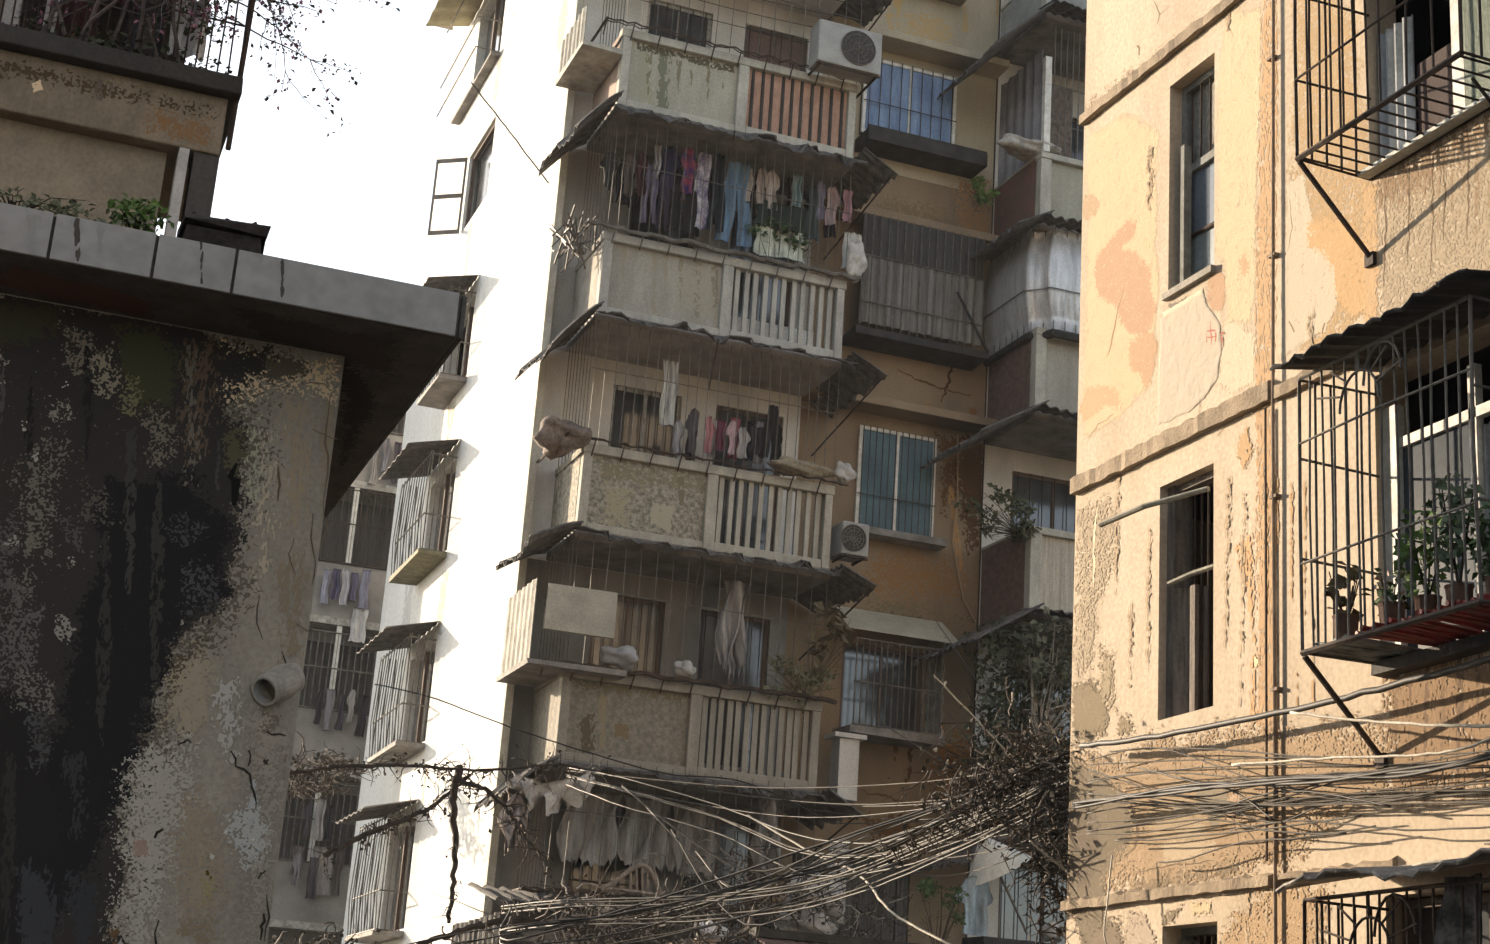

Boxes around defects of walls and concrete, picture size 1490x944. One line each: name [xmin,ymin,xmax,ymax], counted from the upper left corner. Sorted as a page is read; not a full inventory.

water stain [74,218,105,262]
water stain [254,253,285,298]
crack [897,367,971,403]
peeling [1079,5,1263,444]
water stain [1280,0,1490,354]
water stain [0,265,402,944]